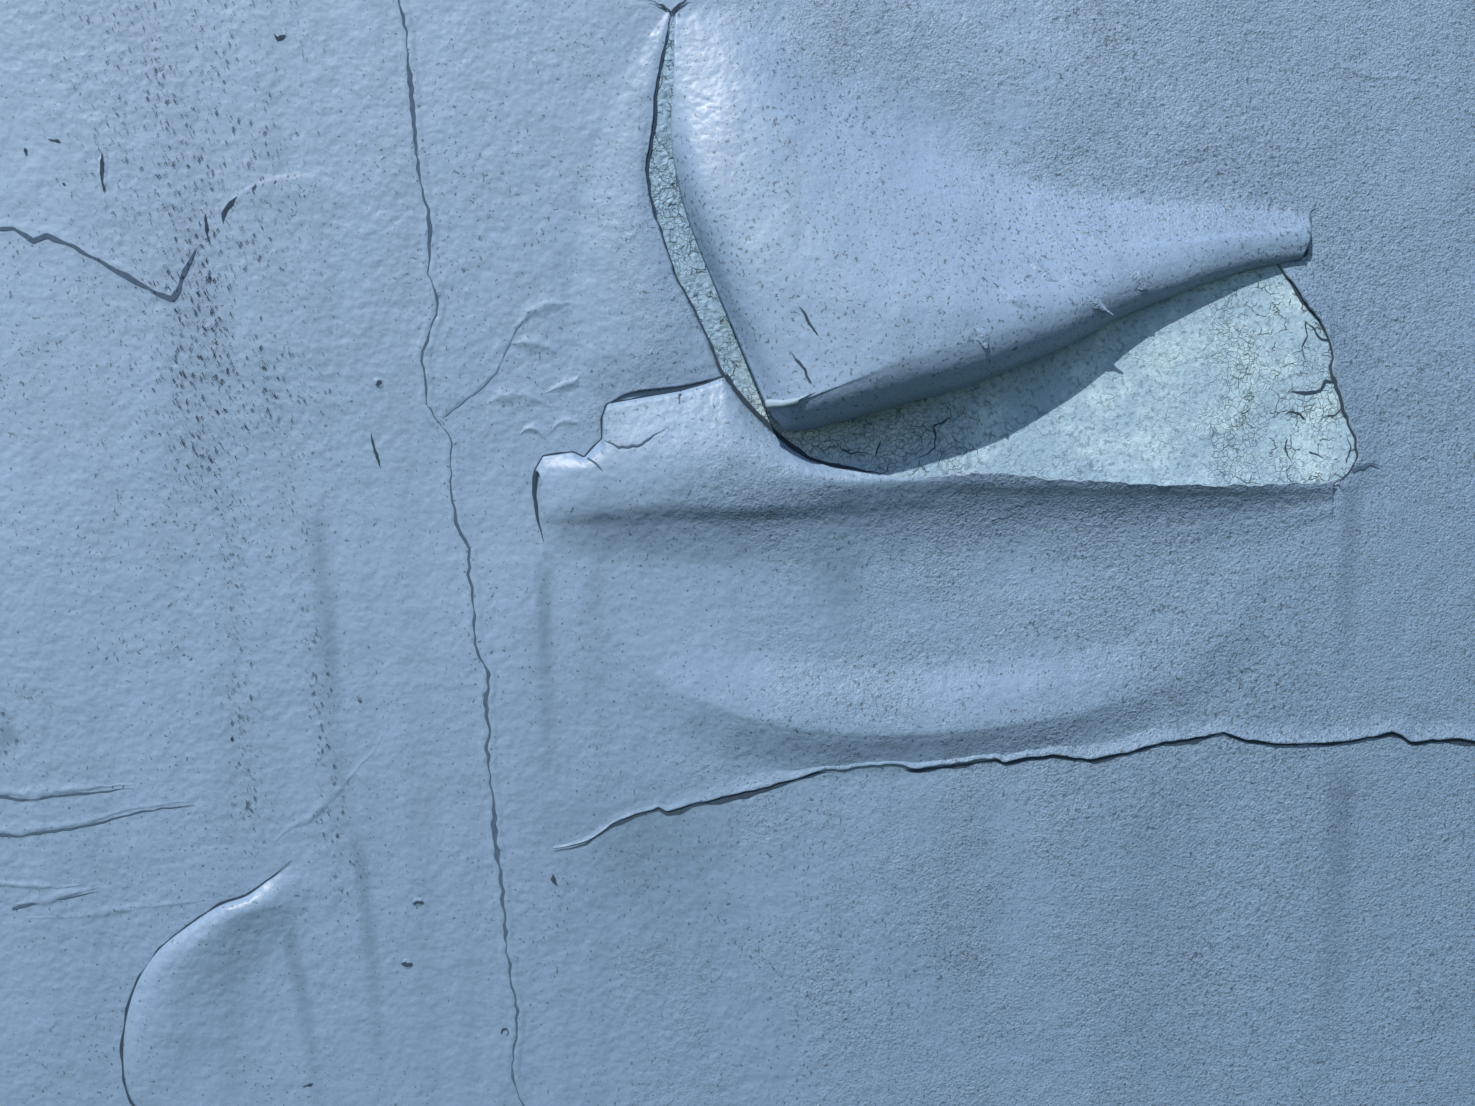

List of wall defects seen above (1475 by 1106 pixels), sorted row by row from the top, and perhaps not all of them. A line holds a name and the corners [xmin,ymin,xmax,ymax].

crack [0,196,237,306]
peeling [568,0,1394,496]
crack [390,0,533,1106]
crack [554,713,1475,851]